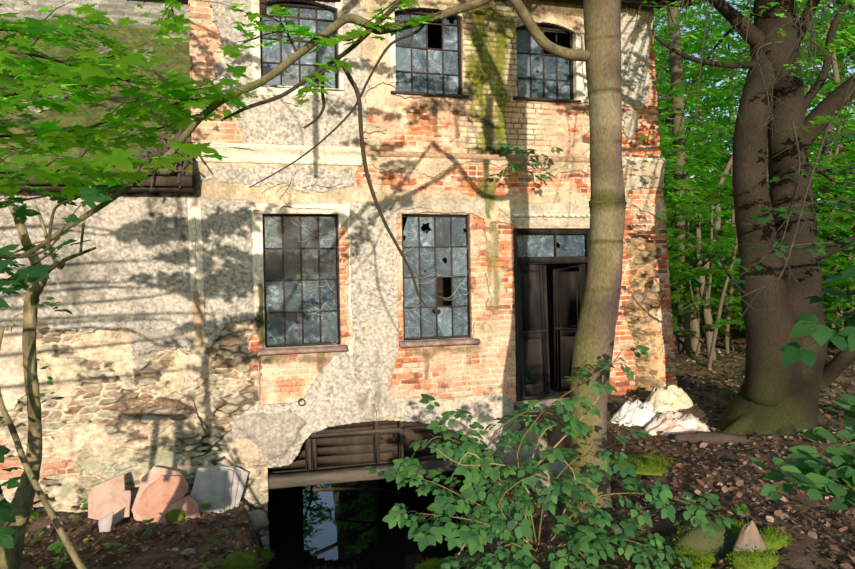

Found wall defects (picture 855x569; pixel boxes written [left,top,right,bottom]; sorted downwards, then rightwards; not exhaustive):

flaking render [188,0,244,144]
damp [414,98,460,137]
flaking render [354,0,591,199]
damp [467,0,514,300]
flaking render [622,29,662,165]
flaking render [0,396,28,503]
flaking render [32,220,353,551]
flaking render [390,212,517,403]
flaking render [609,169,677,395]